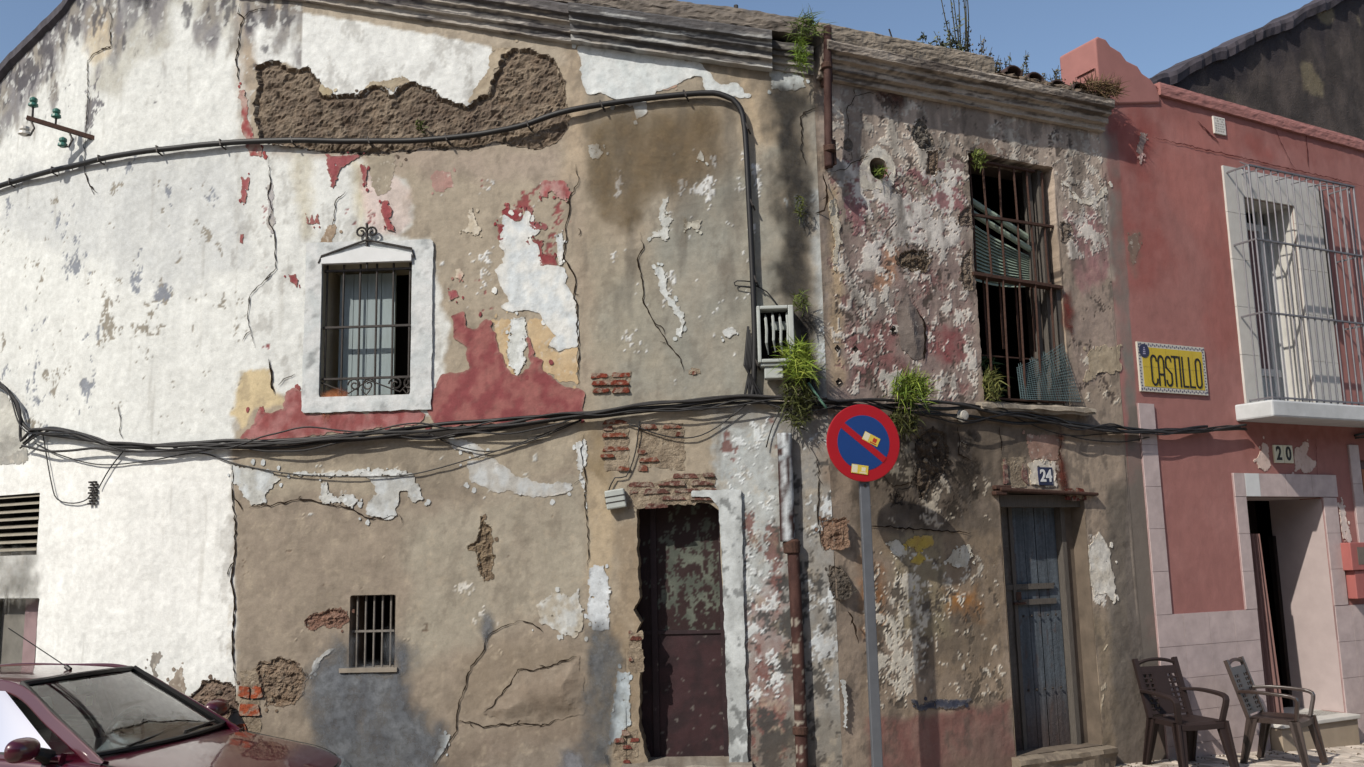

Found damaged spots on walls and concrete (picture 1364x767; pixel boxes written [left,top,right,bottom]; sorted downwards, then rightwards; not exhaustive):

crack [242,157,293,391]
peeling [240,180,716,510]
spalling [237,39,751,232]
crack [637,233,684,372]
damp [771,85,818,410]
peeling [829,137,903,271]
peeling [227,459,431,525]
spalling [467,514,498,582]
peeling [1088,532,1119,604]
spalling [145,648,333,733]
damp [307,642,443,767]
crack [436,620,576,763]